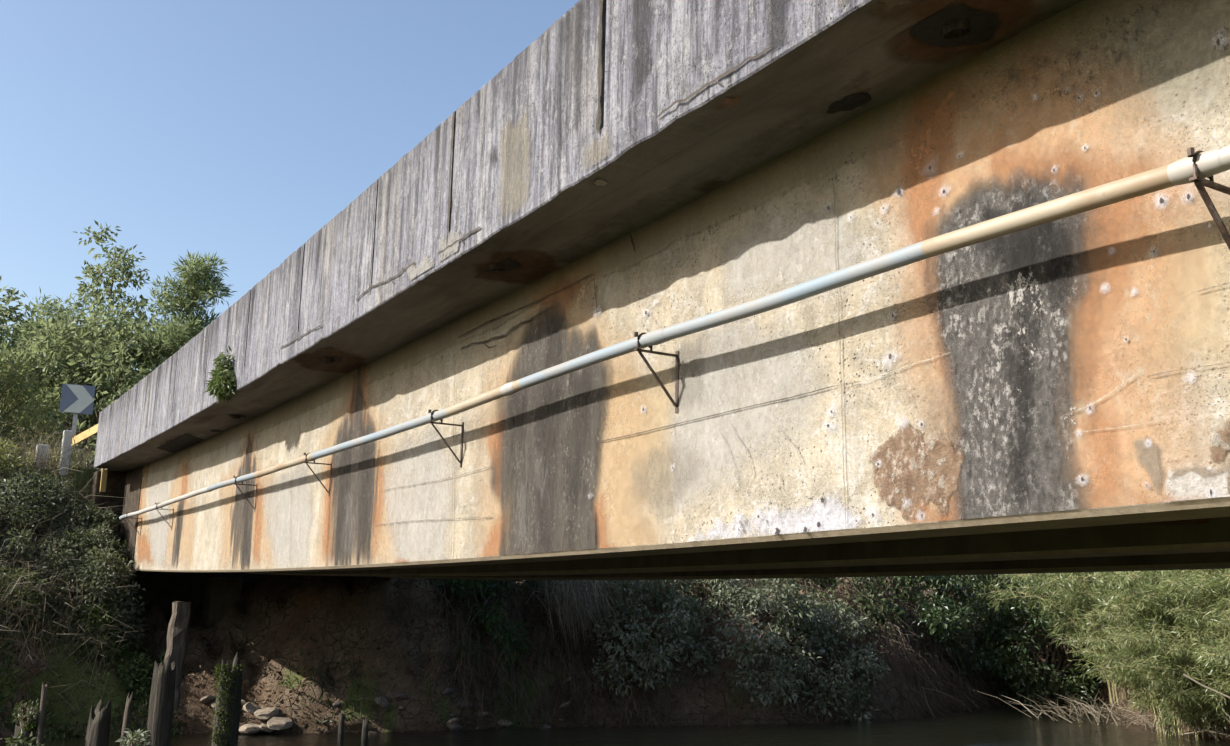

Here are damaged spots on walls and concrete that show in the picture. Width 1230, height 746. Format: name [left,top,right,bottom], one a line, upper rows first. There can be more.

damp [937,169,1080,236]
rust [888,82,1131,241]
damp [231,435,310,569]
rust [295,347,393,559]
damp [331,368,449,566]
crack [458,274,598,350]
damp [492,309,607,555]
rust [477,252,676,555]
spalling [868,421,964,520]
rust [911,255,951,375]
damp [936,212,1091,520]
rust [1060,188,1176,504]